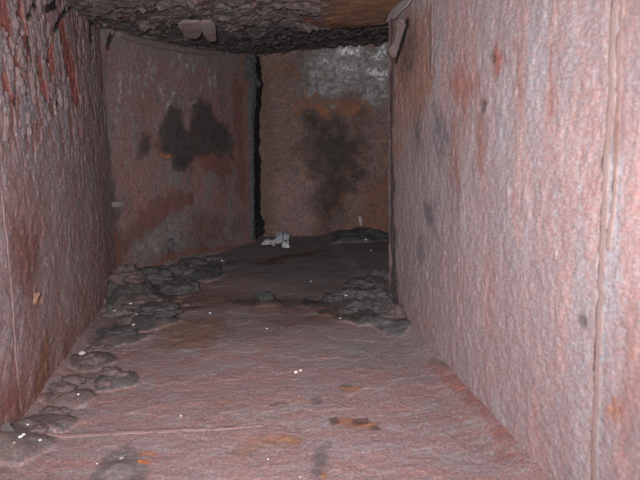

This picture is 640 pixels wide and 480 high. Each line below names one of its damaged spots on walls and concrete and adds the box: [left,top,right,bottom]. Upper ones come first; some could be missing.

peeling [2,0,70,125]
peeling [89,0,411,64]
crack [245,53,265,240]
leakage [307,20,398,304]